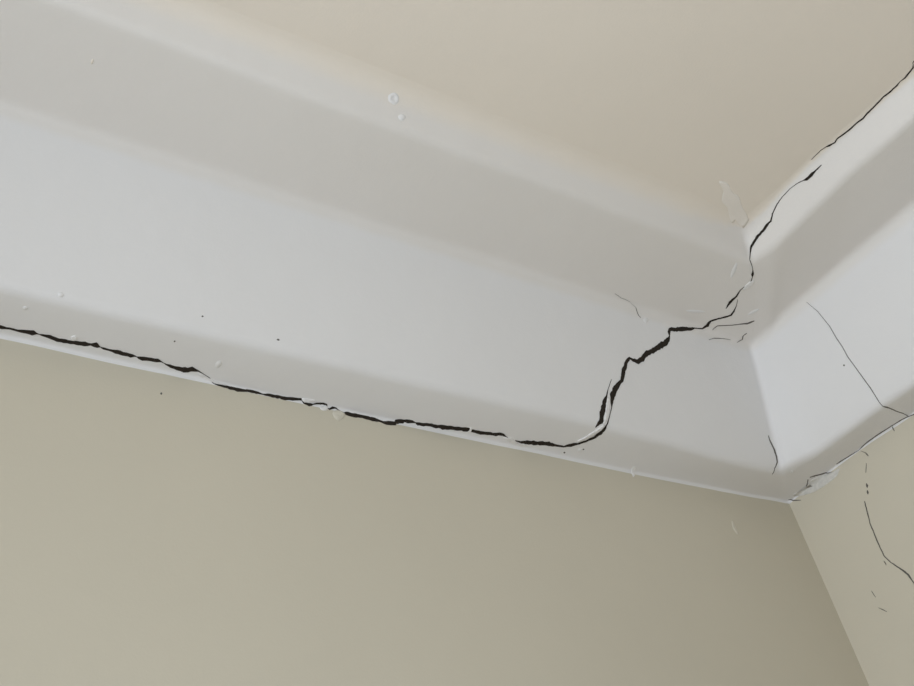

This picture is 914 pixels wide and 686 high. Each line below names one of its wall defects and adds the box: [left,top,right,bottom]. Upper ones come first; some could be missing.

crack [0,61,914,464]
crack [864,483,914,583]